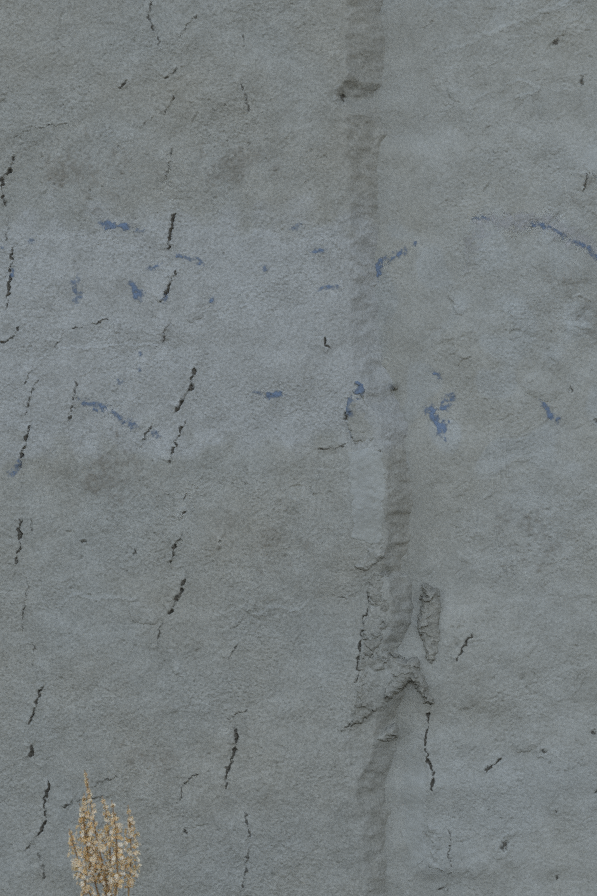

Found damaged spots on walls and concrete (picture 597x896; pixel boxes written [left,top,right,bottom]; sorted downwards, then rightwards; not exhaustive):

crack [0,157,14,206]
crack [6,237,14,305]
crack [167,213,176,249]
crack [20,375,32,467]
crack [169,368,196,462]
crack [15,519,33,564]
crack [158,540,186,636]
spalling [355,545,396,659]
crack [28,689,42,757]
crack [225,711,246,789]
crack [424,704,435,791]
crack [28,778,112,879]